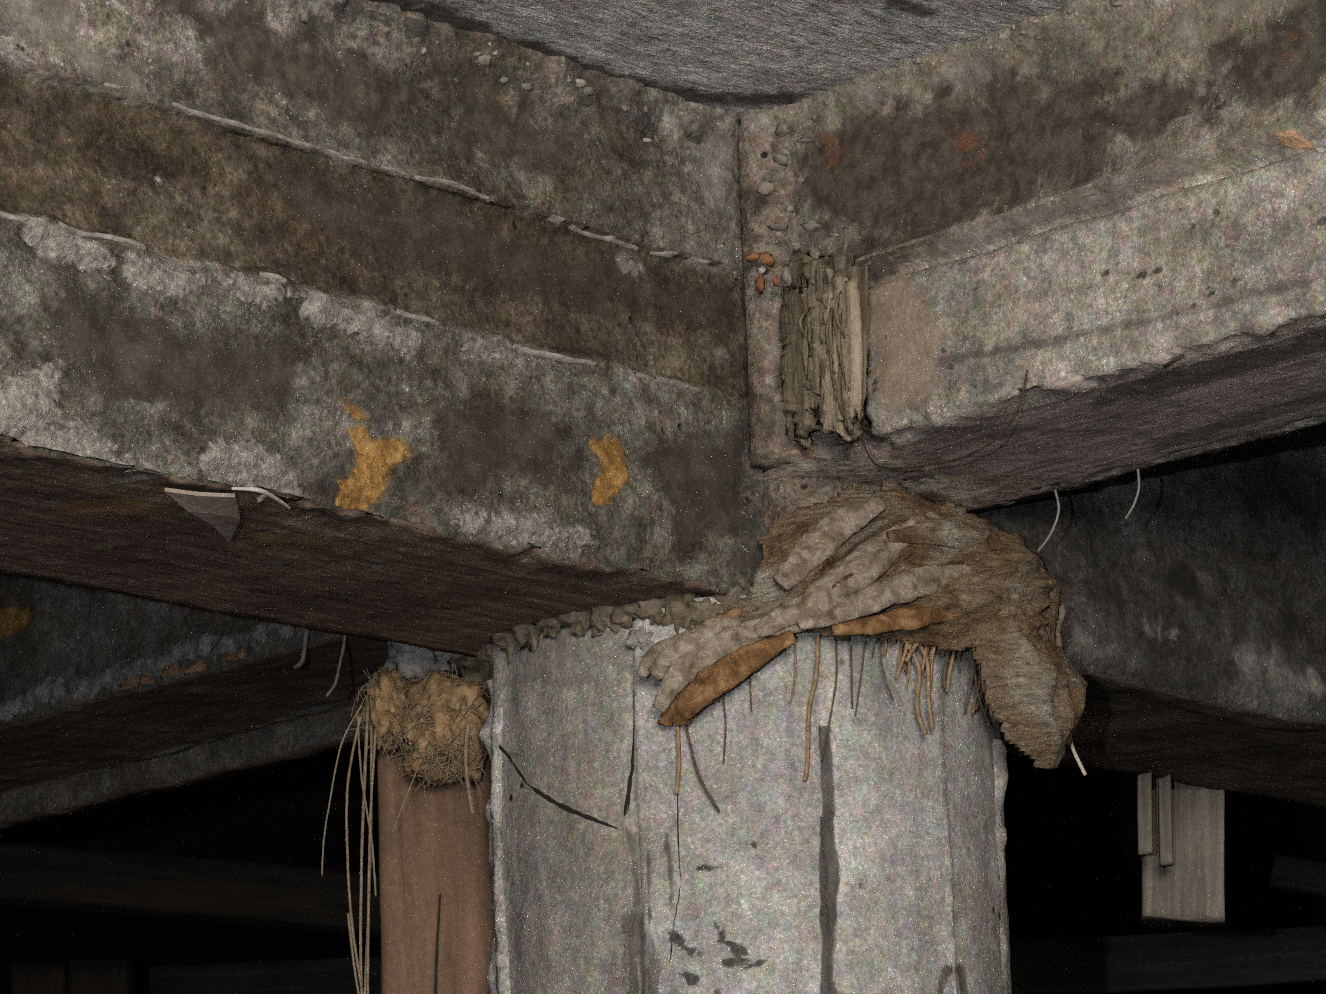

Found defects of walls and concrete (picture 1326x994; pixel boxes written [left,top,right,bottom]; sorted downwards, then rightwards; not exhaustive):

damp [2,0,142,105]
damp [169,0,421,154]
damp [367,0,822,175]
damp [696,140,736,209]
damp [796,0,1326,282]
damp [66,295,297,415]
rust [336,397,412,516]
crack [491,689,635,829]